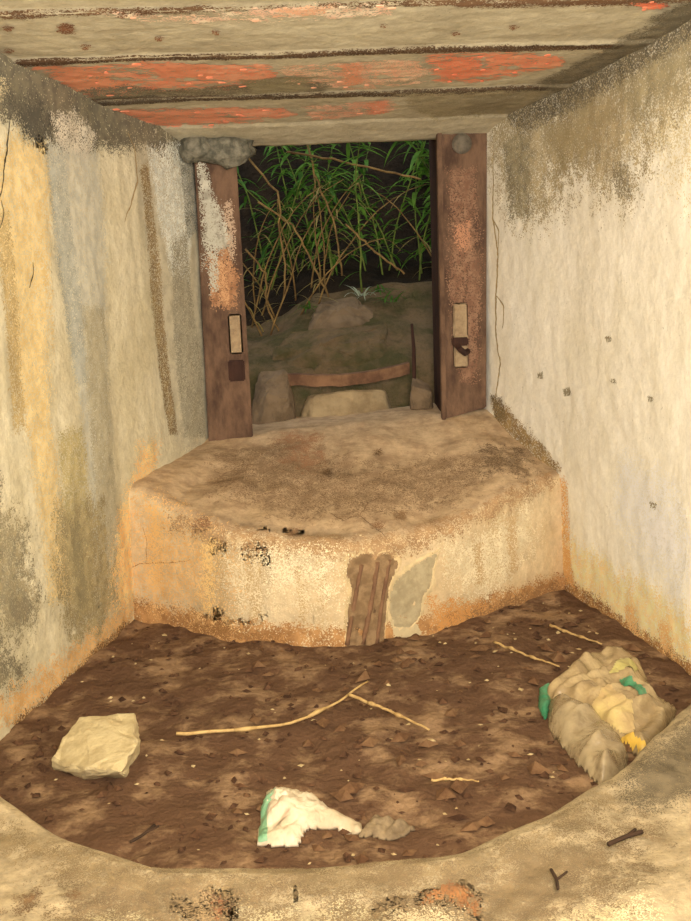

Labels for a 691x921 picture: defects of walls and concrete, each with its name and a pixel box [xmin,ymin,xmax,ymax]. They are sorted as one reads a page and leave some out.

peeling [97,2,397,25]
peeling [25,52,565,97]
peeling [112,98,400,128]
rust [203,245,241,312]
rust [444,163,485,387]
damp [0,53,237,700]
rust [0,430,363,731]
rust [404,476,691,675]
rust [383,622,395,639]